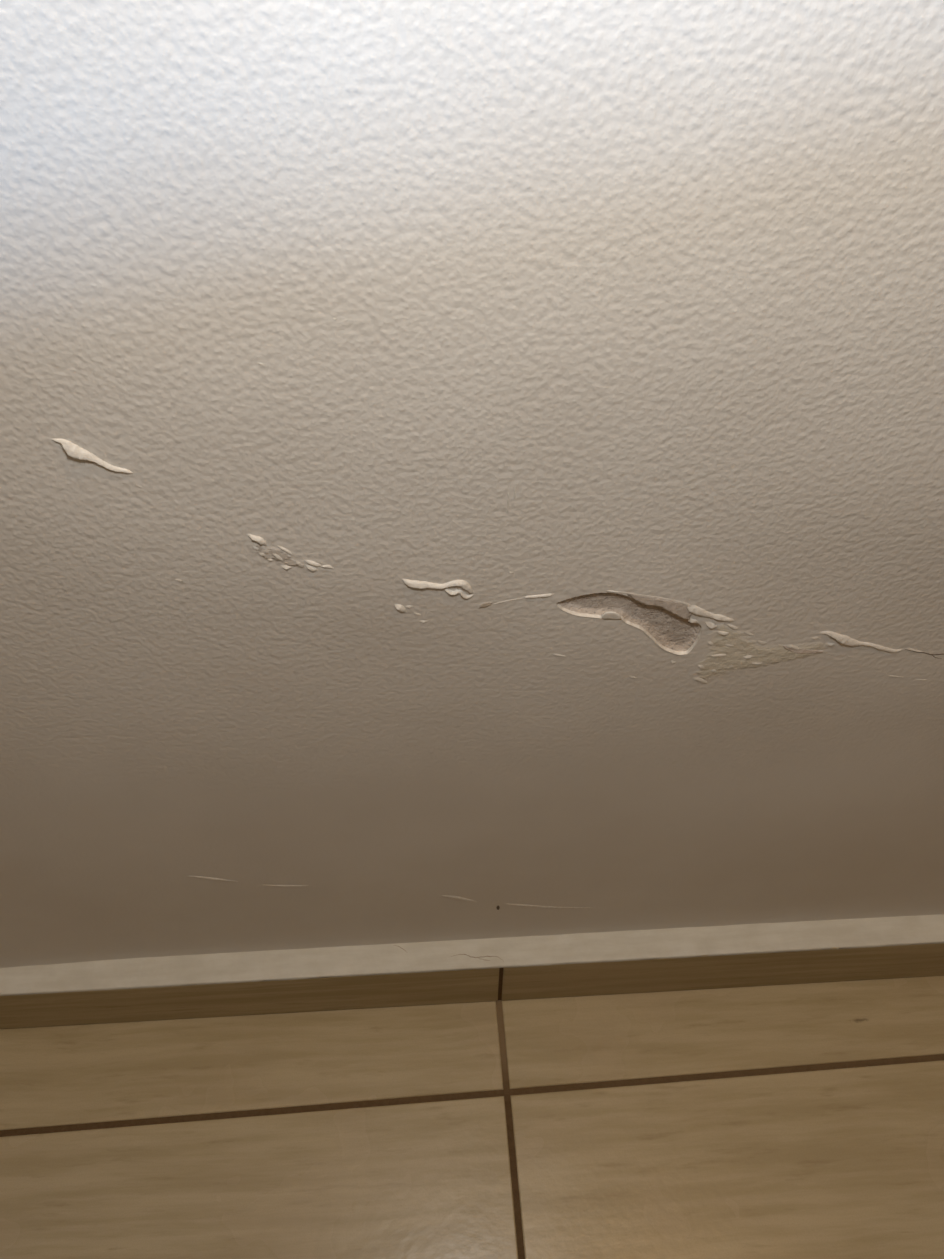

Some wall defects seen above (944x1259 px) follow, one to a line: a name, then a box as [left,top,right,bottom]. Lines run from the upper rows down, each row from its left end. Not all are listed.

peeling [47,438,145,489]
spalling [247,534,334,572]
peeling [401,579,494,610]
flaking render [556,590,739,664]
peeling [783,631,904,654]